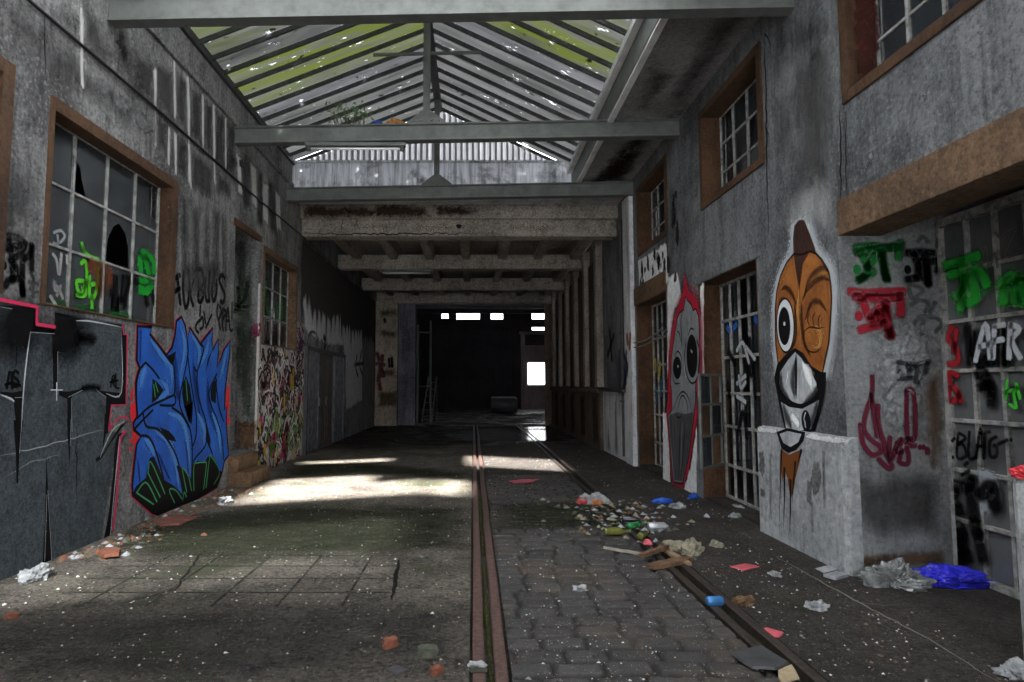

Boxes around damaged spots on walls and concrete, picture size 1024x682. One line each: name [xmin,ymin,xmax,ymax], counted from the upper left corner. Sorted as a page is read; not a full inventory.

leakage [52,8,282,232]
crack [839,111,847,197]
crack [120,549,203,604]